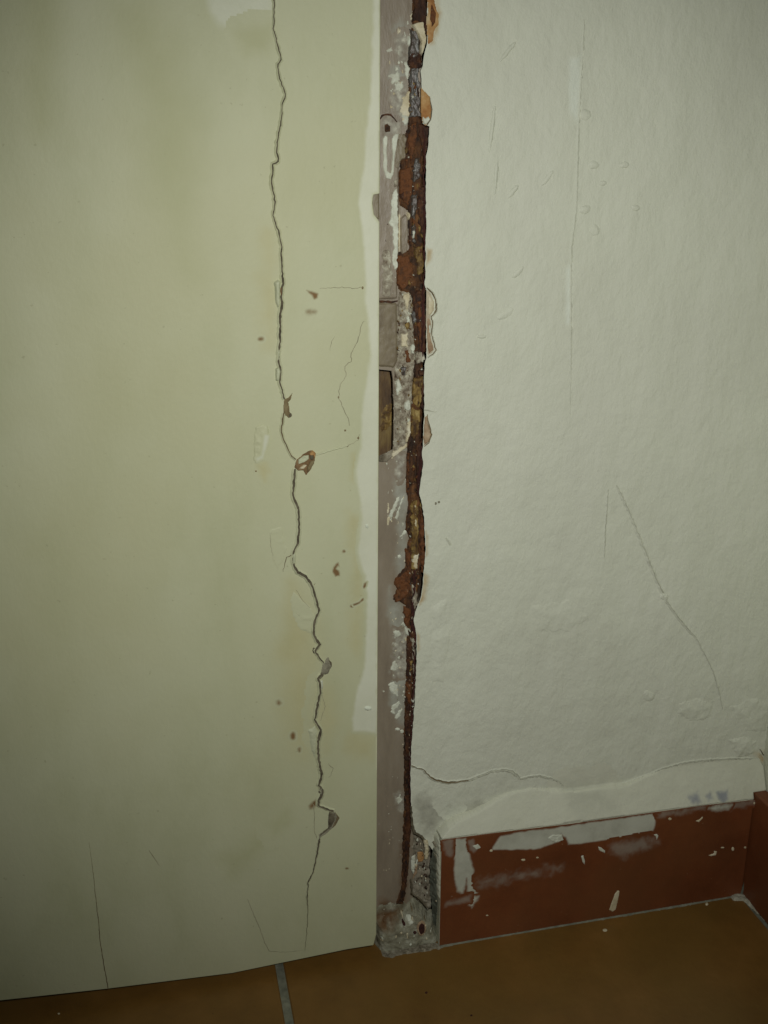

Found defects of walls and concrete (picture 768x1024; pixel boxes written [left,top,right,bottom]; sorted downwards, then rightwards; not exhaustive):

crack [248,0,364,952]
corrosion [376,0,429,940]
spalling [390,776,431,908]
peeling [380,0,445,745]
crack [411,764,563,787]